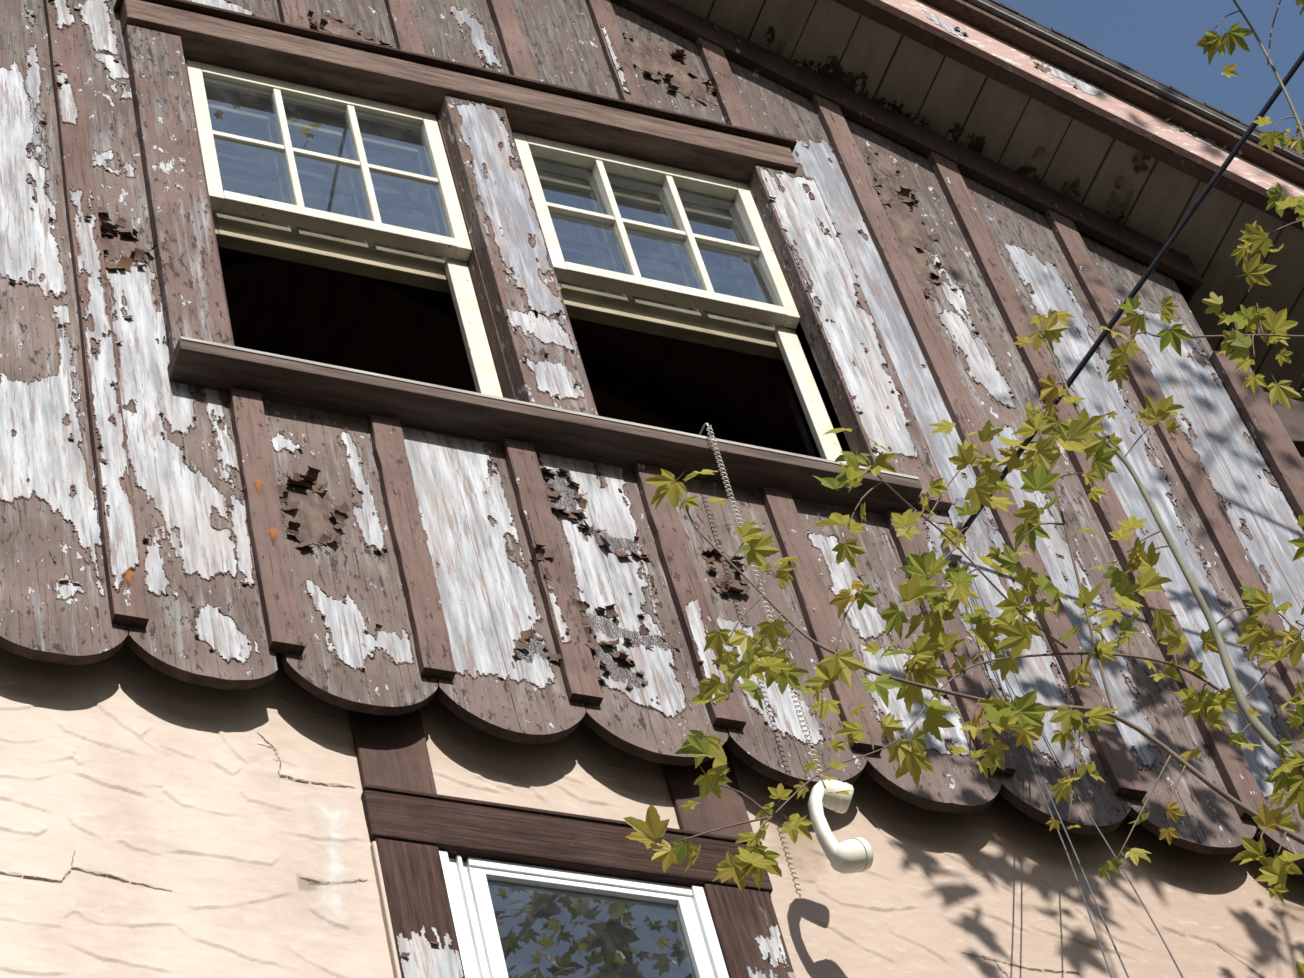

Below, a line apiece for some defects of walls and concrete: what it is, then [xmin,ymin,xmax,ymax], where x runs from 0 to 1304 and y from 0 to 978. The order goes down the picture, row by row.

peeling [50,0,133,100]
peeling [191,0,257,15]
peeling [450,99,585,401]
peeling [0,44,256,601]
peeling [268,427,388,554]
peeling [758,136,1092,772]
peeling [989,240,1304,800]
peeling [191,603,261,665]
peeling [304,578,415,671]
peeling [402,427,831,745]
peeling [397,926,463,978]
peeling [747,925,795,978]